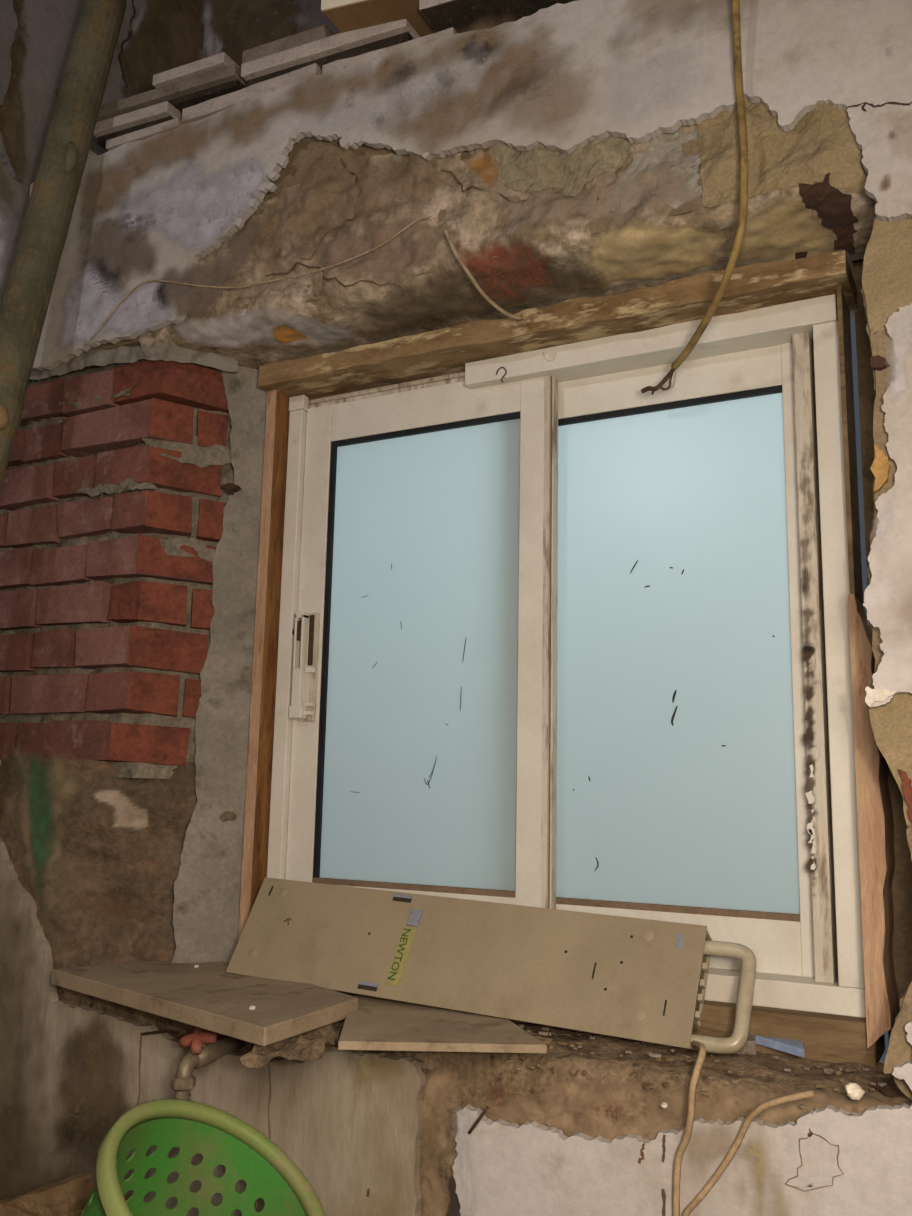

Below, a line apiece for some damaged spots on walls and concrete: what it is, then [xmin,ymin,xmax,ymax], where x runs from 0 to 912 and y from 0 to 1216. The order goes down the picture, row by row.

crack [118,0,136,88]
crack [848,102,912,112]
peeling [247,155,289,209]
leakage [60,28,586,348]
crack [266,158,402,288]
crack [440,169,532,203]
flaking render [466,245,551,301]
peeling [697,99,912,501]
peeling [865,686,912,860]
peeling [20,761,52,887]
peeling [883,982,912,1074]
peeling [485,1080,887,1141]